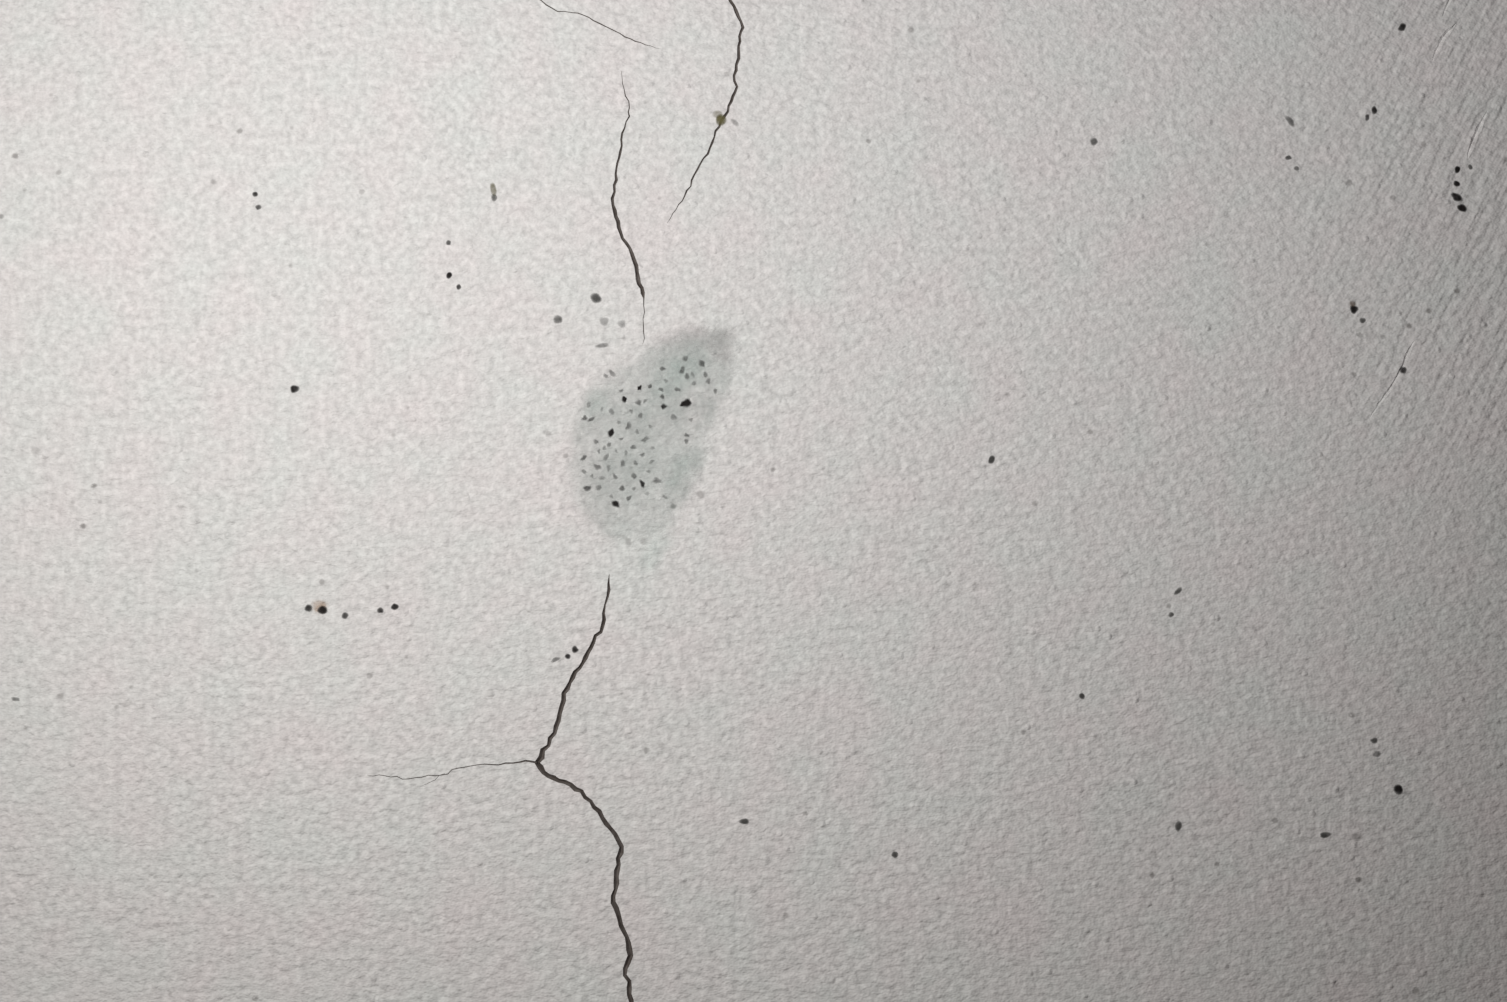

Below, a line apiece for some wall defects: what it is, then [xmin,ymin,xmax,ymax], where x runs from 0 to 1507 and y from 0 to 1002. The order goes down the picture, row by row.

crack [540,0,660,342]
crack [667,0,745,223]
water stain [622,385,691,409]
crack [368,577,634,1002]